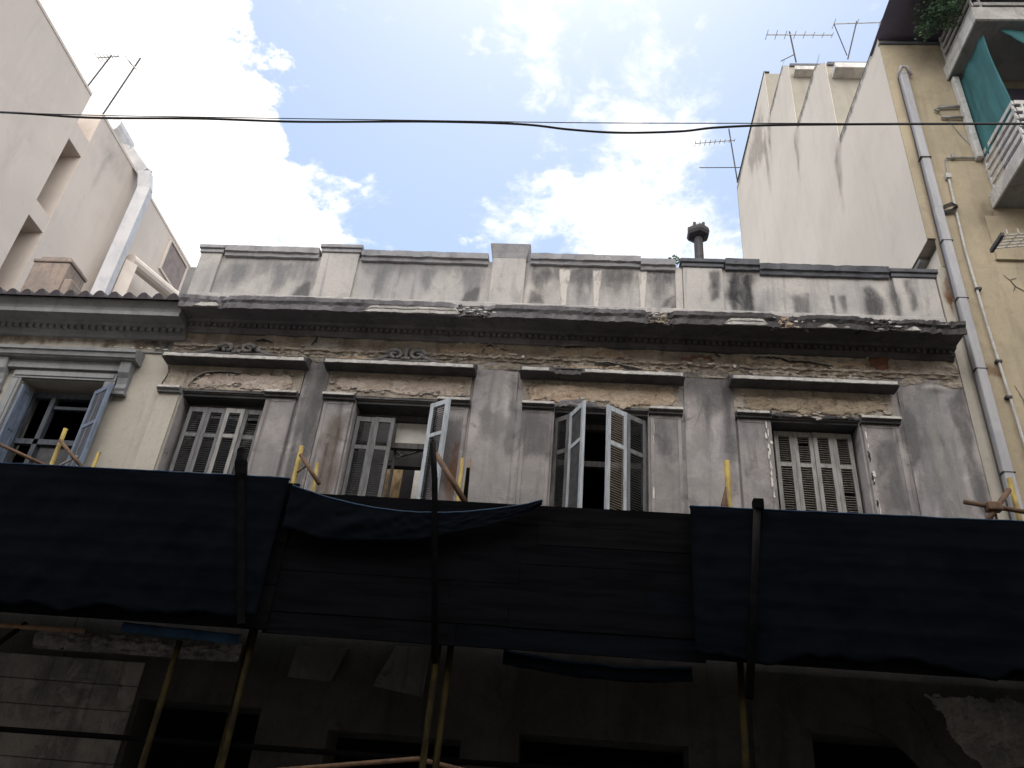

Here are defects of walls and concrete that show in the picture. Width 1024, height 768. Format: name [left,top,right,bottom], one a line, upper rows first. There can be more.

water stain [462,274,479,301]
water stain [542,269,570,305]
water stain [593,271,601,306]
water stain [638,271,676,308]
water stain [711,272,753,311]
water stain [865,284,899,315]
spalling [548,347,662,371]
spalling [192,372,296,392]
spalling [329,375,466,397]
spalling [526,382,675,410]
spalling [737,393,892,498]
spalling [924,694,1024,768]